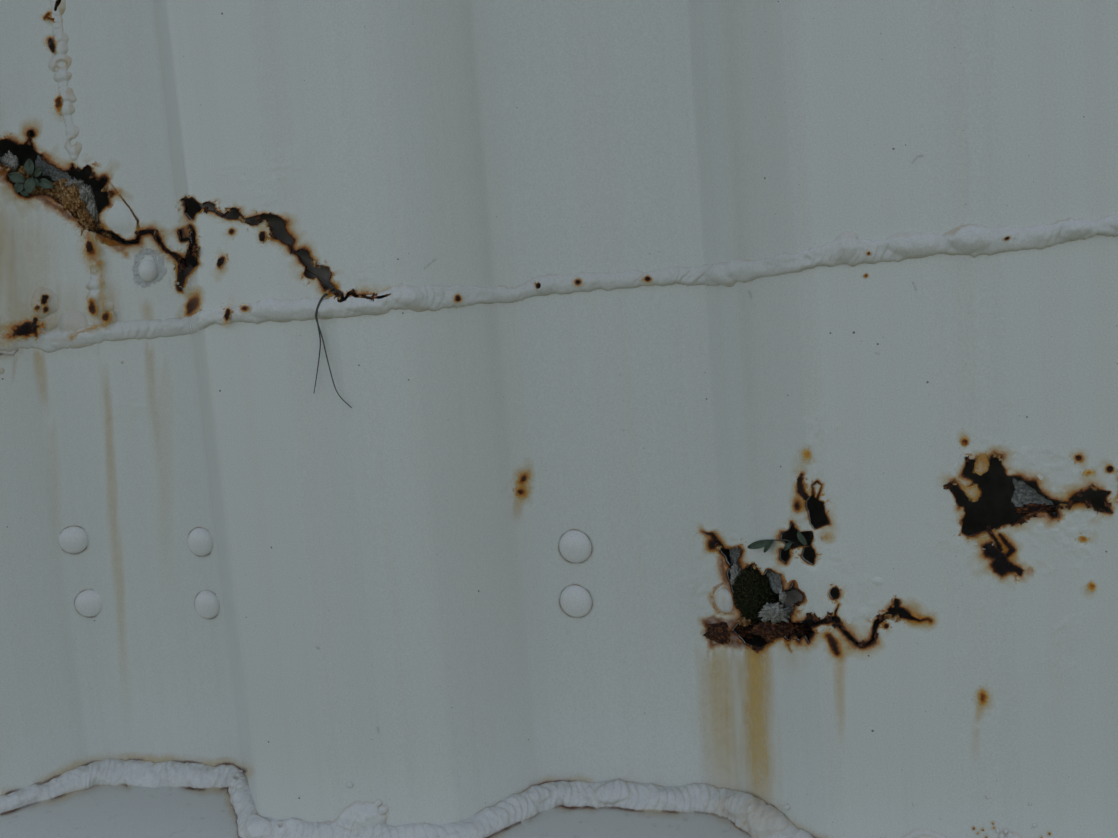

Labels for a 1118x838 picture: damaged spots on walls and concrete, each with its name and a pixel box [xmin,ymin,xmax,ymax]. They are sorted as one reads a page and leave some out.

rust [82,221,112,265]
rust [203,206,275,243]
rust [0,294,49,355]
rust [70,284,112,339]
rust [174,225,201,317]
rust [223,305,249,323]
rust [320,282,391,302]
rust [513,470,530,498]
rust [1059,453,1118,513]
rust [964,512,1037,581]
rust [748,636,797,774]
rust [978,689,989,706]